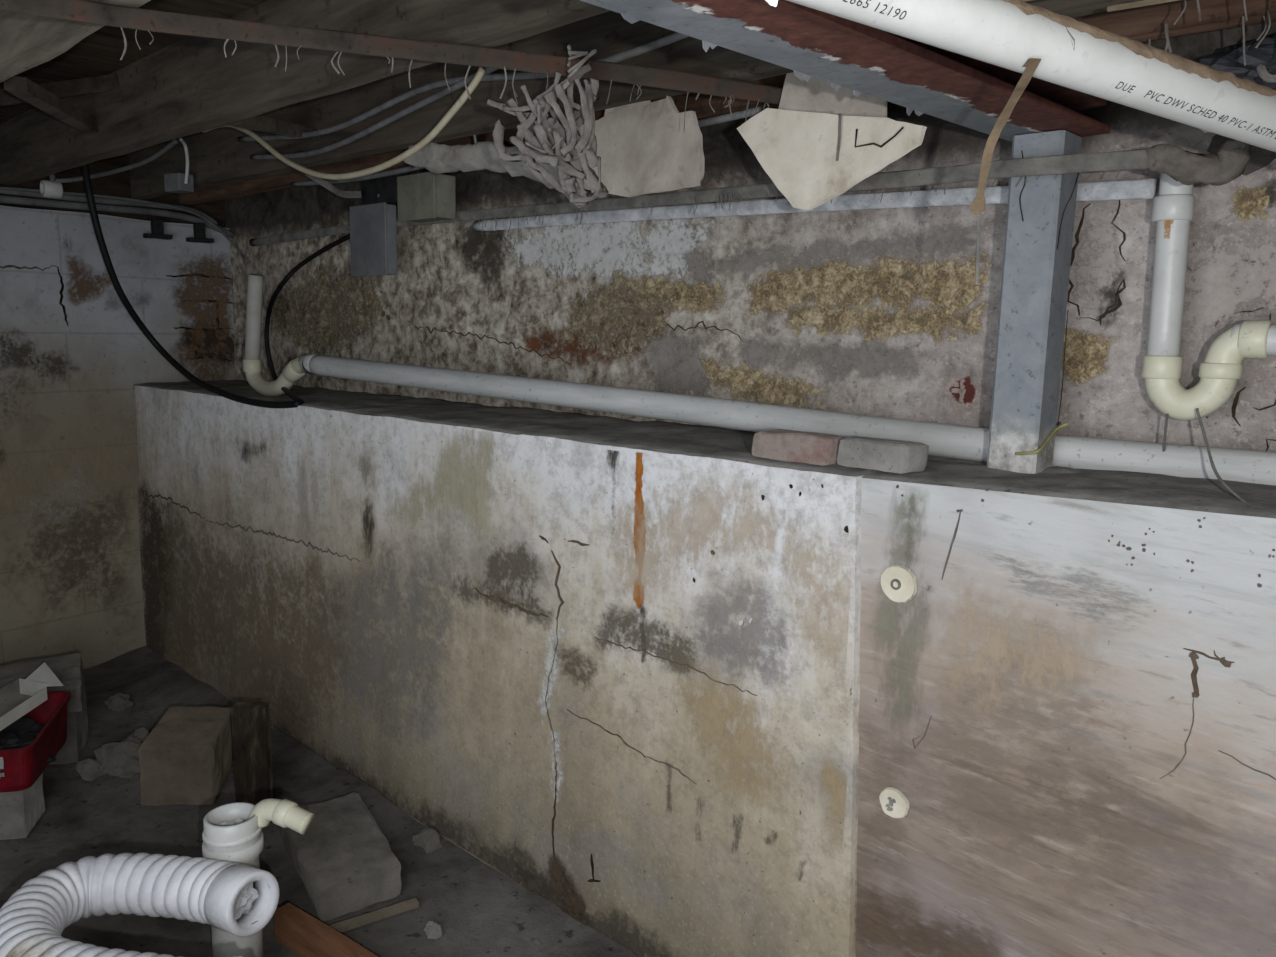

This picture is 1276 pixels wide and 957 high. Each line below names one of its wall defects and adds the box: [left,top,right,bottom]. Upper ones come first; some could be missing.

damp [461,225,504,284]
crack [1057,173,1126,432]
damp [0,336,65,375]
corrosion [944,377,979,413]
crack [1206,387,1276,451]
crack [145,494,362,562]
damp [453,547,551,622]
corrosion [633,453,645,662]
damp [540,629,595,711]
damp [597,593,784,677]
crack [473,535,696,916]
crack [1160,648,1234,779]